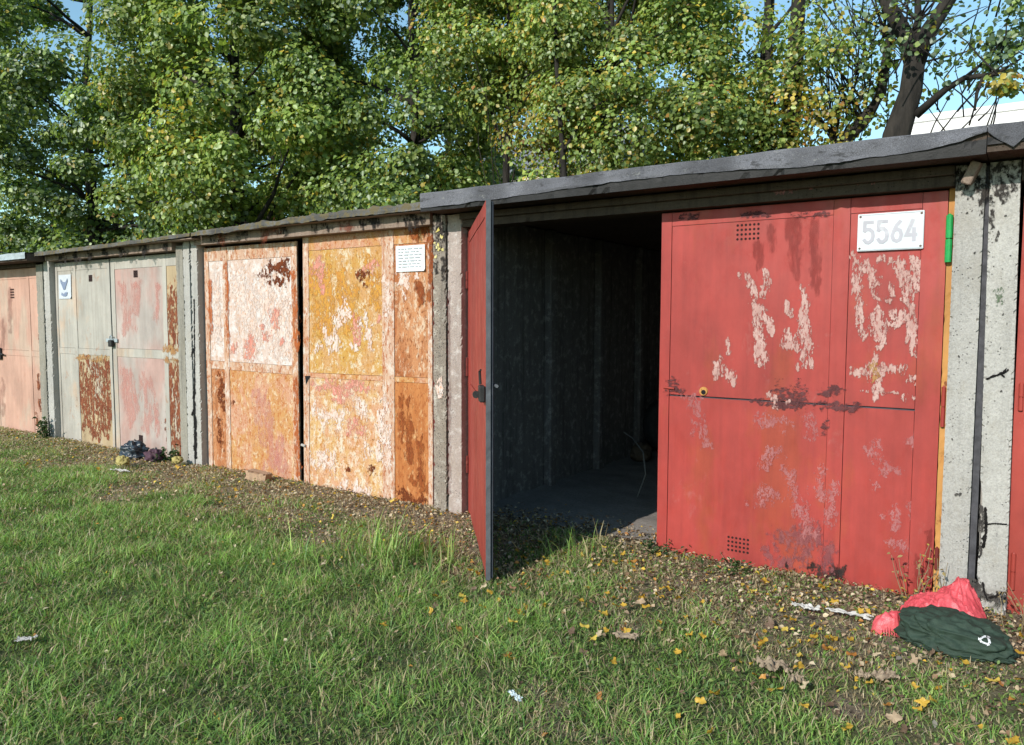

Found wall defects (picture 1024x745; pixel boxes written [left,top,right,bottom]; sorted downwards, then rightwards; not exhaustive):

corrosion [74,353,112,442]
corrosion [163,285,181,456]
peeling [212,263,292,365]
corrosion [293,378,303,478]
corrosion [257,253,382,353]
peeling [310,372,392,496]
peeling [313,258,419,358]
corrosion [395,393,429,505]
peeling [712,336,737,388]
peeling [737,267,818,372]
corrosion [750,378,862,436]
peeling [849,250,921,402]